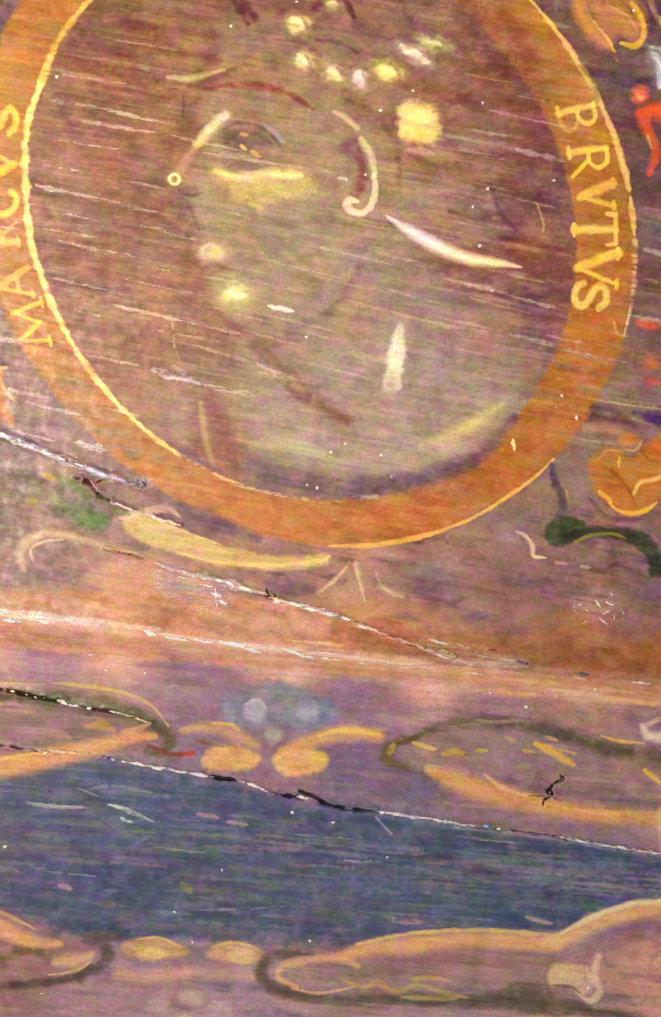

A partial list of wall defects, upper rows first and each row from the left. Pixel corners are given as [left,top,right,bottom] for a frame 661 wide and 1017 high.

crack [0,432,181,526]
crack [111,549,456,657]
crack [0,688,152,724]
crack [0,744,661,854]